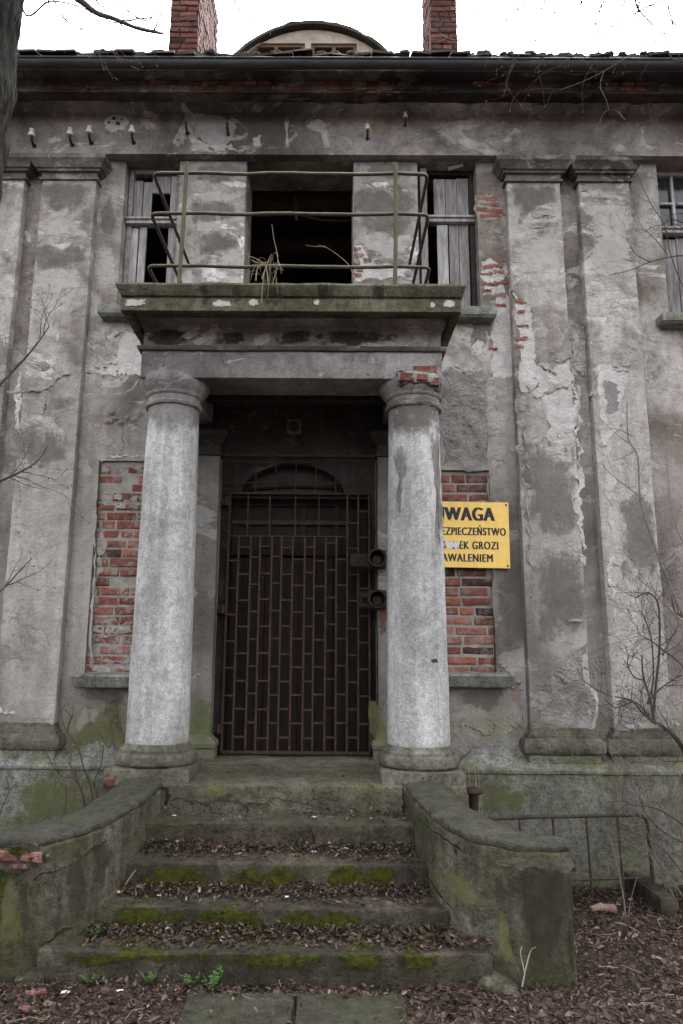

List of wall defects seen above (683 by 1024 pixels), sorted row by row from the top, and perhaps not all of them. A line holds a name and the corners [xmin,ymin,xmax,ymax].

flaking render [104,114,129,133]
flaking render [192,115,239,152]
flaking render [473,192,506,223]
crack [6,330,127,425]
flaking render [396,258,632,623]
crack [161,786,344,844]